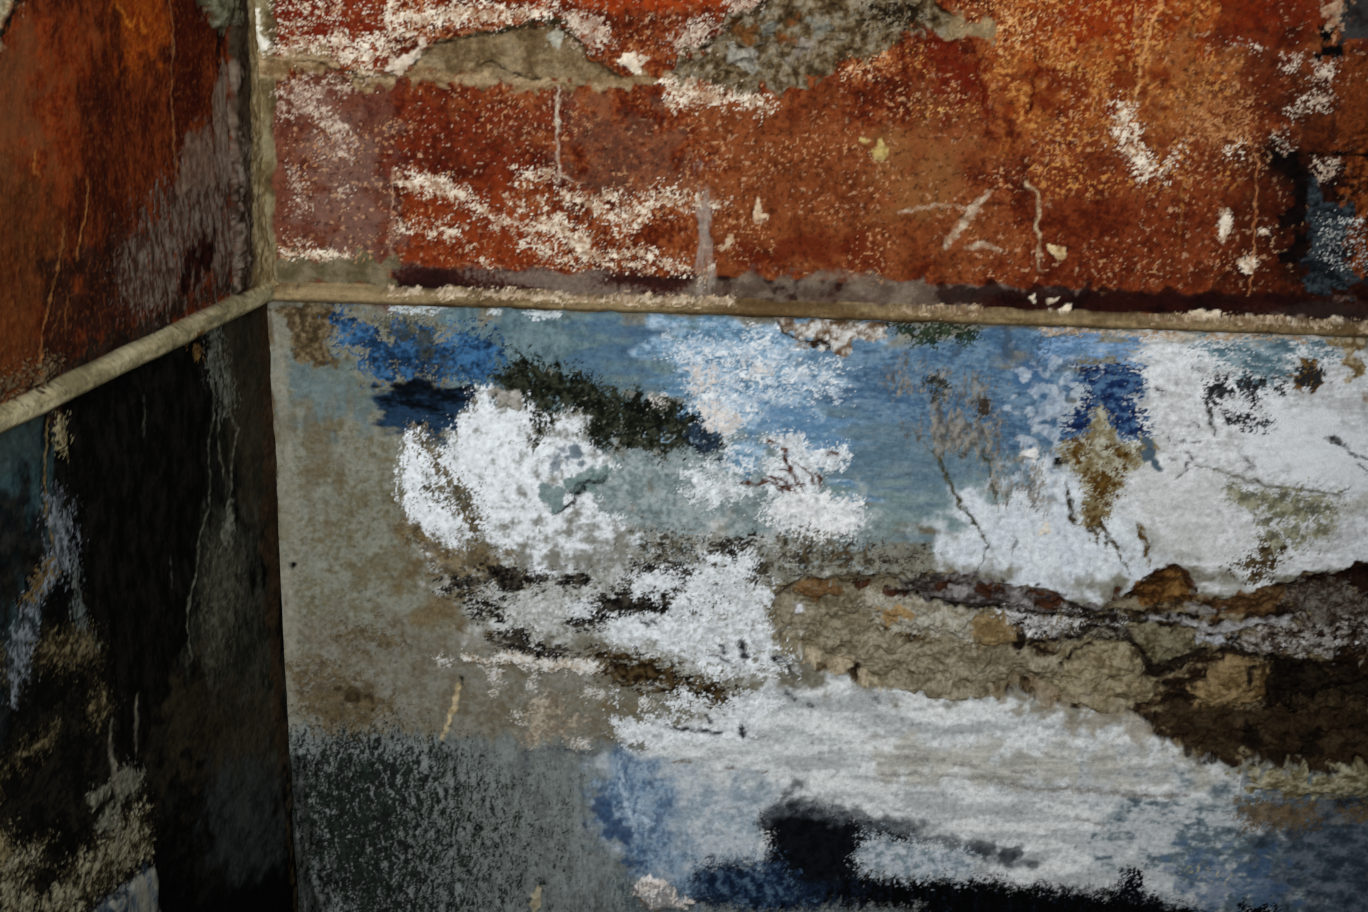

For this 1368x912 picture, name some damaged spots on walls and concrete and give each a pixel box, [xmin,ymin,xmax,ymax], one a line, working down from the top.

spalling [101,0,1358,372]
rust [184,324,207,366]
peeling [381,159,1368,776]
crack [929,445,1021,570]
leakage [284,603,1304,912]